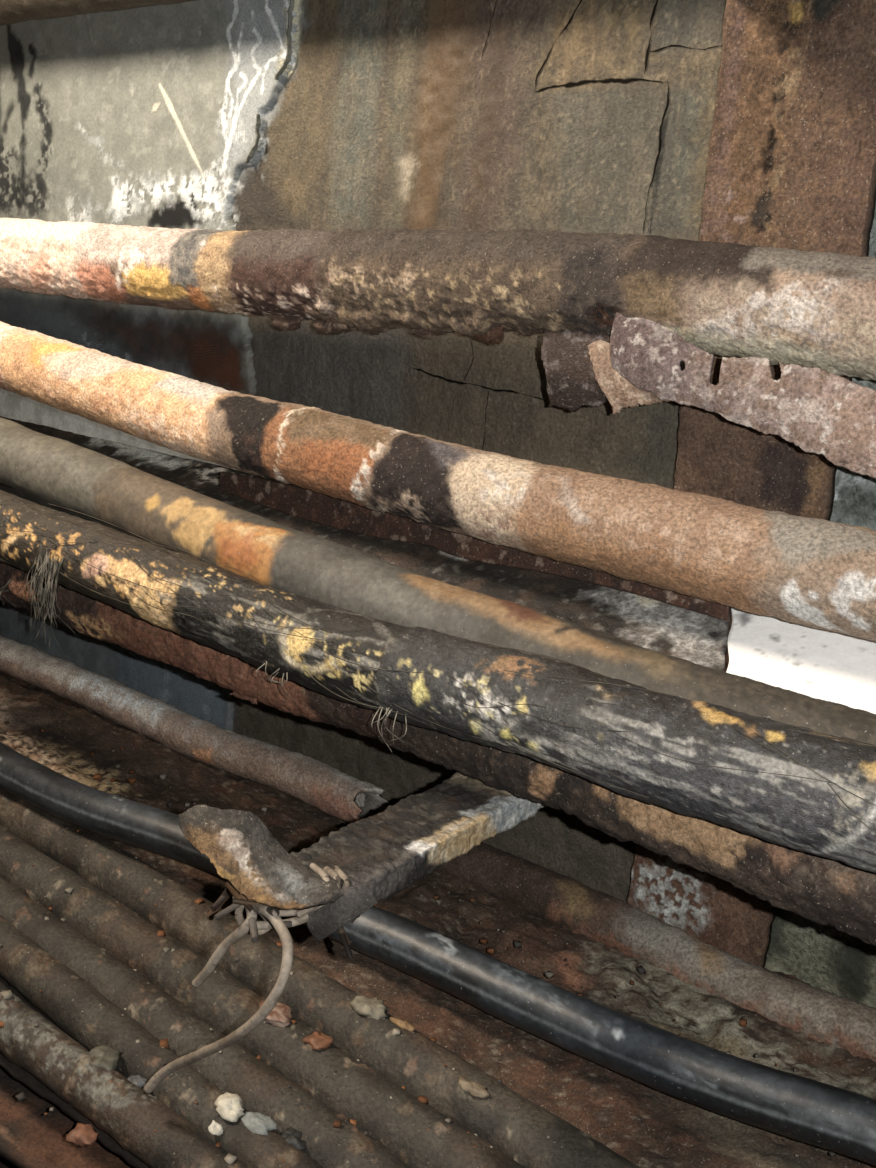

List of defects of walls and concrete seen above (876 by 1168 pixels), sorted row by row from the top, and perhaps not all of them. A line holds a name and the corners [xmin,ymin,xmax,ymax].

damp [68,203,92,222]
damp [108,0,301,228]
crack [534,0,723,232]
crack [414,338,548,450]